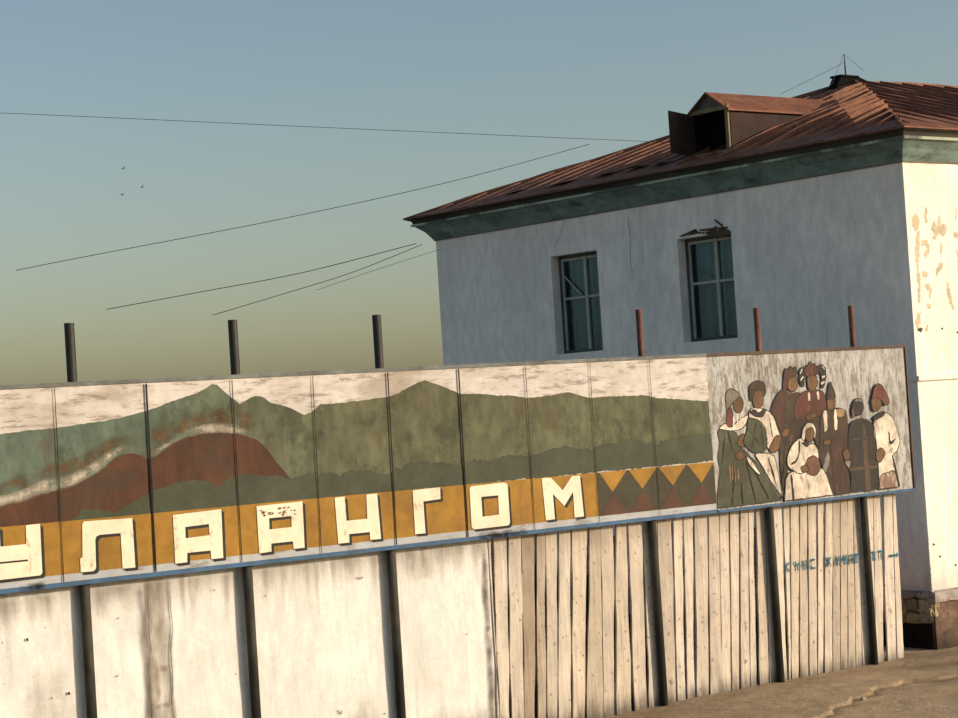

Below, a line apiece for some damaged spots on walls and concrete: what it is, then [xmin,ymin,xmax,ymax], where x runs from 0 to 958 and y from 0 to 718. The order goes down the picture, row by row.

peeling [912,207,958,332]
water stain [143,584,169,718]